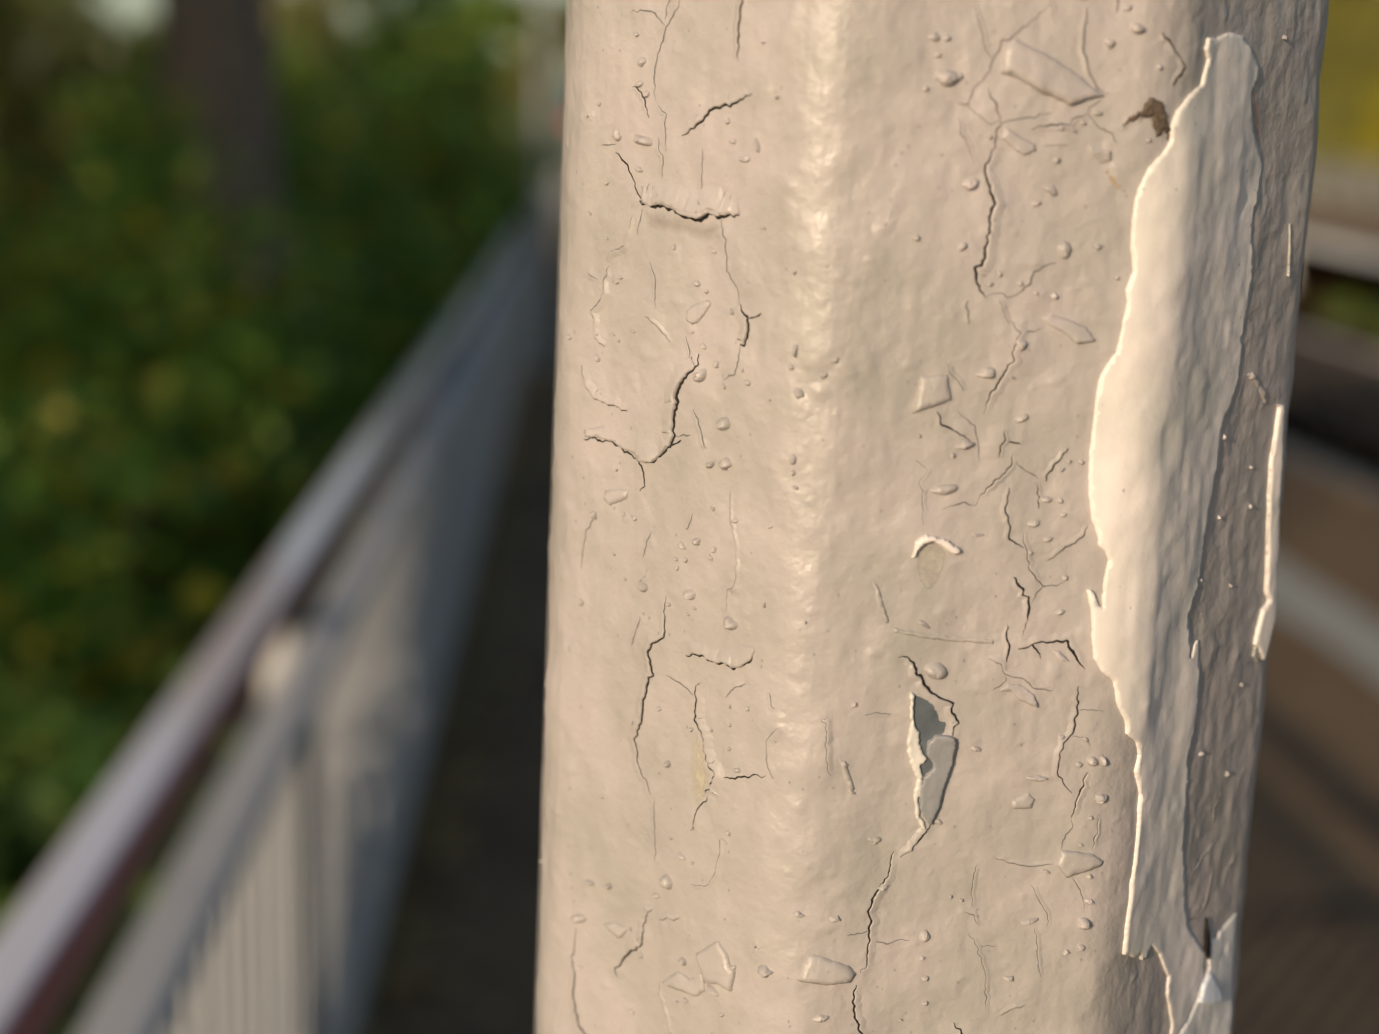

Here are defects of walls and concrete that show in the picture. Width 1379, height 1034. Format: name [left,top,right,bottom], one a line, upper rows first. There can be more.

crack [1160,33,1186,86]
crack [581,0,762,491]
peeling [911,534,961,588]
crack [916,0,1119,1034]
peeling [1087,33,1262,1034]
peeling [1252,404,1285,663]
crack [609,595,783,979]
crack [821,718,835,775]
peeling [907,692,928,831]
crack [898,656,959,736]
crack [566,926,585,1034]
crack [848,827,930,1034]